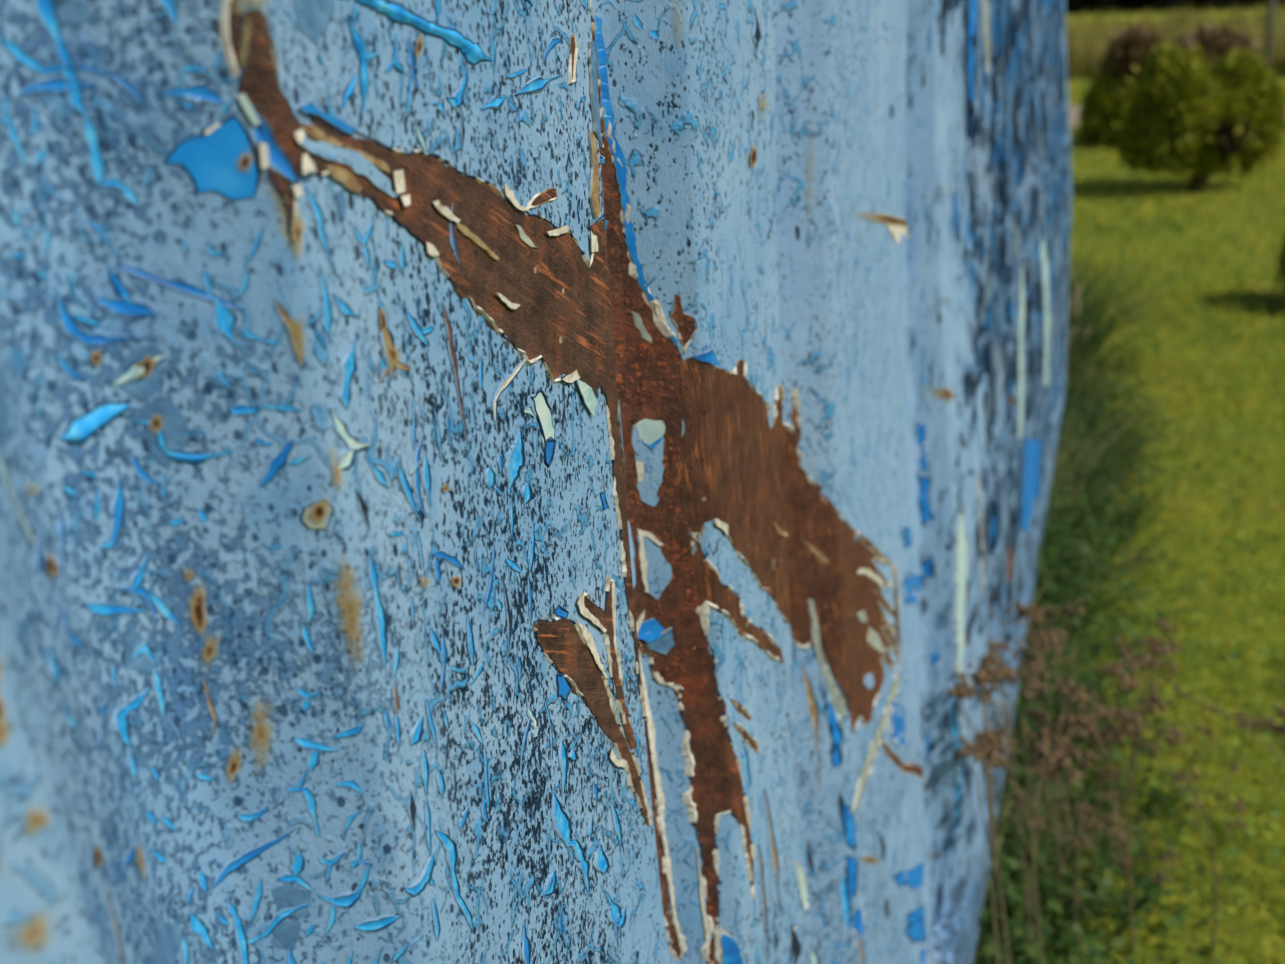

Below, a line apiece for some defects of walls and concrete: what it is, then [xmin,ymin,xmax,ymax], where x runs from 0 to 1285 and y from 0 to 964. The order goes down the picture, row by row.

peeling [292,123,399,198]
peeling [514,224,536,247]
peeling [531,389,557,468]
peeling [617,399,664,507]
corrosion [311,501,327,522]
peeling [627,520,672,600]
corrosion [185,570,216,661]
peeling [857,610,886,653]
corrosion [0,698,9,744]
peeling [556,673,572,701]
peeling [808,599,850,768]
peeling [840,673,906,948]